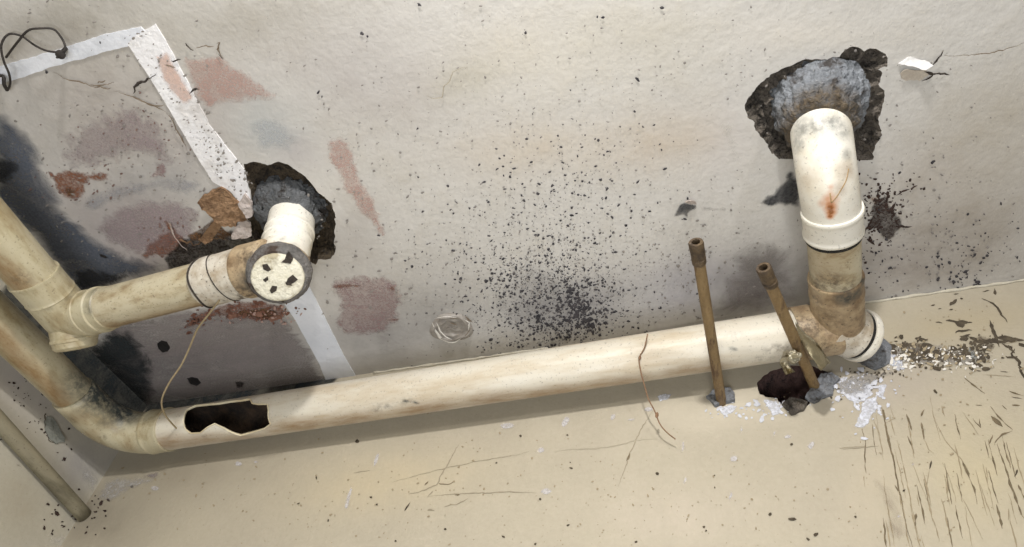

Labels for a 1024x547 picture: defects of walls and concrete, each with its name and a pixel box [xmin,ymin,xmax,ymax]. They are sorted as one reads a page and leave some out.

spalling [745,47,933,160]
crack [923,46,1016,81]
corrosion [49,171,106,198]
leakage [0,120,155,290]
spalling [168,162,336,265]
leakage [370,77,767,354]
leakage [764,173,799,205]
mould [859,146,1021,298]
corrosion [179,300,307,335]
peeling [705,293,1024,440]
mould [43,495,110,535]